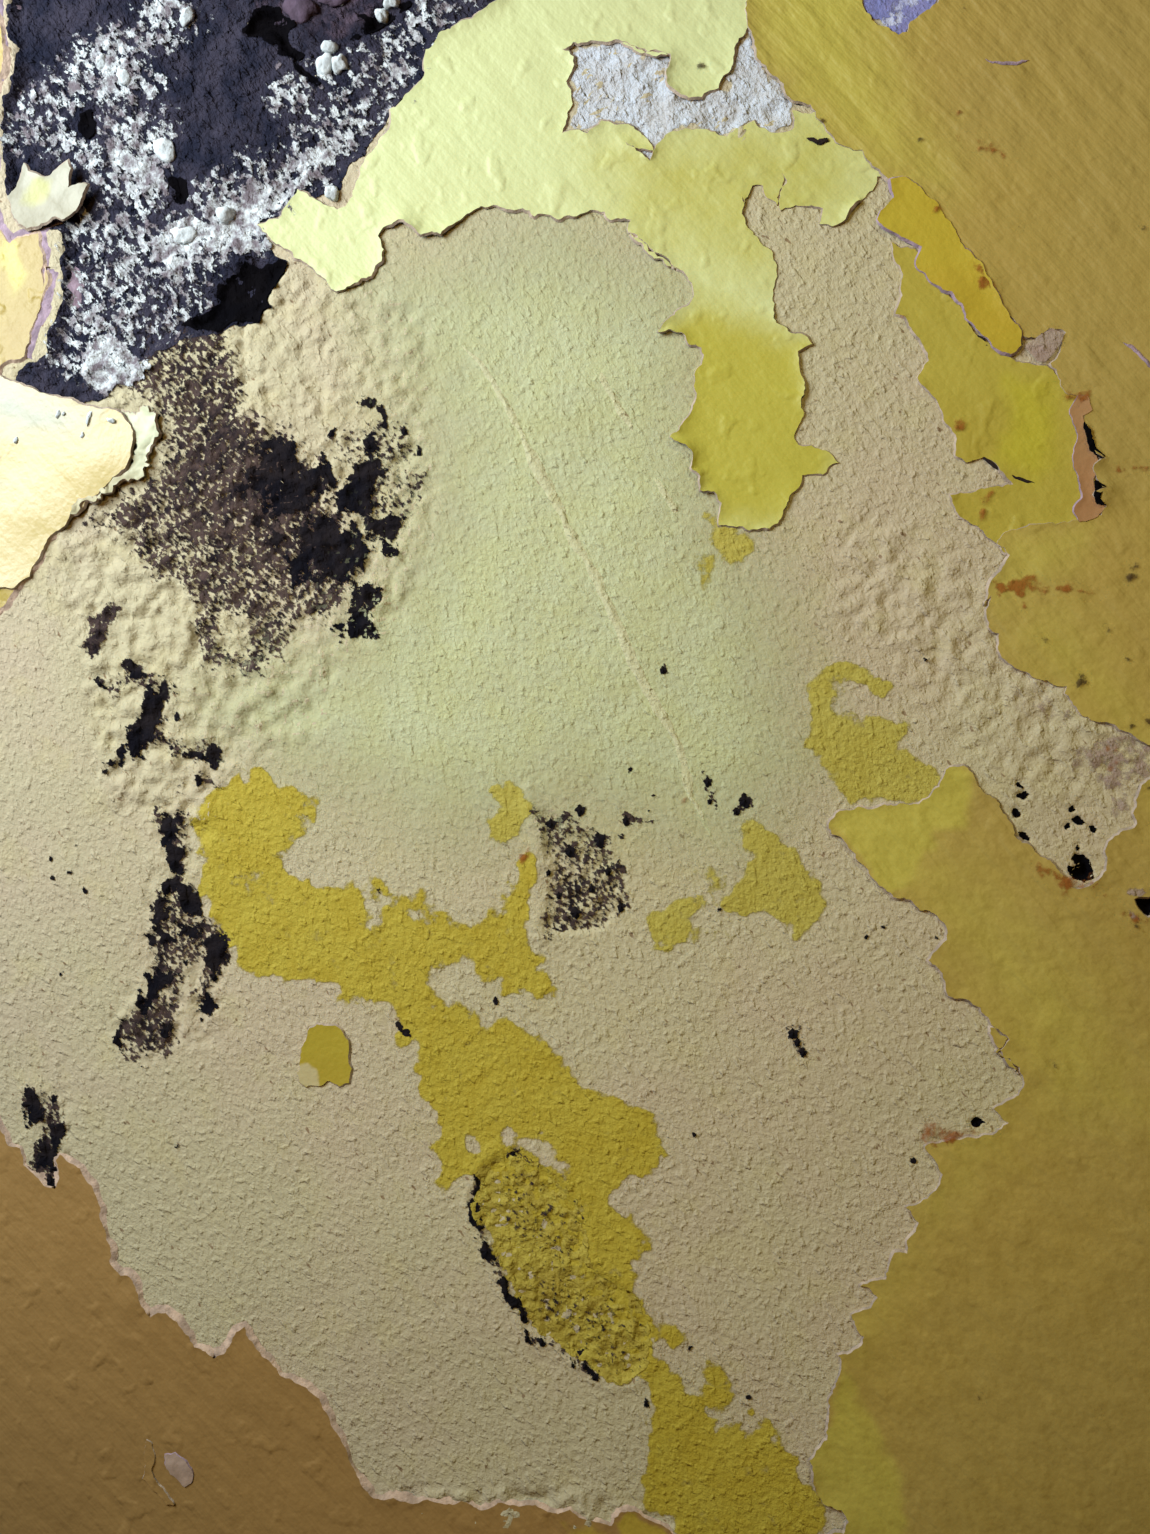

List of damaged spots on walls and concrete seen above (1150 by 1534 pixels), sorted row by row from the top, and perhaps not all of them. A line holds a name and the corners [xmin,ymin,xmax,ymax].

flaking render [881,0,929,32]
flaking render [571,31,792,159]
flaking render [0,0,495,403]
peeling [891,242,1106,556]
leakage [76,260,826,1534]
peeling [297,1022,354,1088]
leakage [20,1084,66,1187]